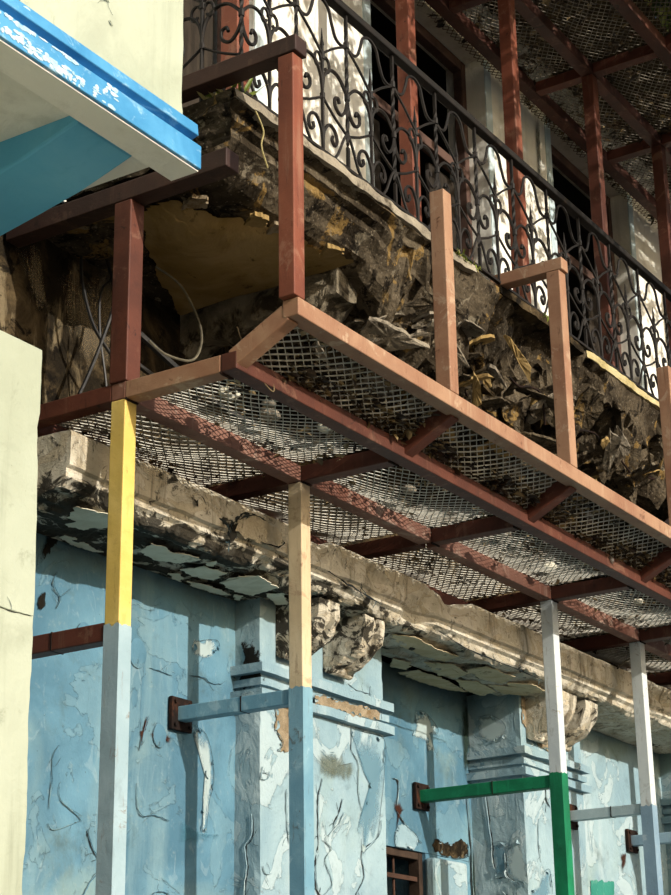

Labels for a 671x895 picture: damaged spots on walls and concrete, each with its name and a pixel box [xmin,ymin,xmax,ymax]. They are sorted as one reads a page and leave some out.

peeling [0,11,119,111]
spalling [341,291,435,351]
spalling [455,305,557,454]
crack [0,598,33,616]
peeling [138,543,288,605]
crack [47,745,97,895]
crack [244,814,271,895]
crack [260,767,289,846]
crack [314,684,376,895]
crack [356,778,422,894]
spalling [394,823,419,850]
spalling [432,838,469,859]